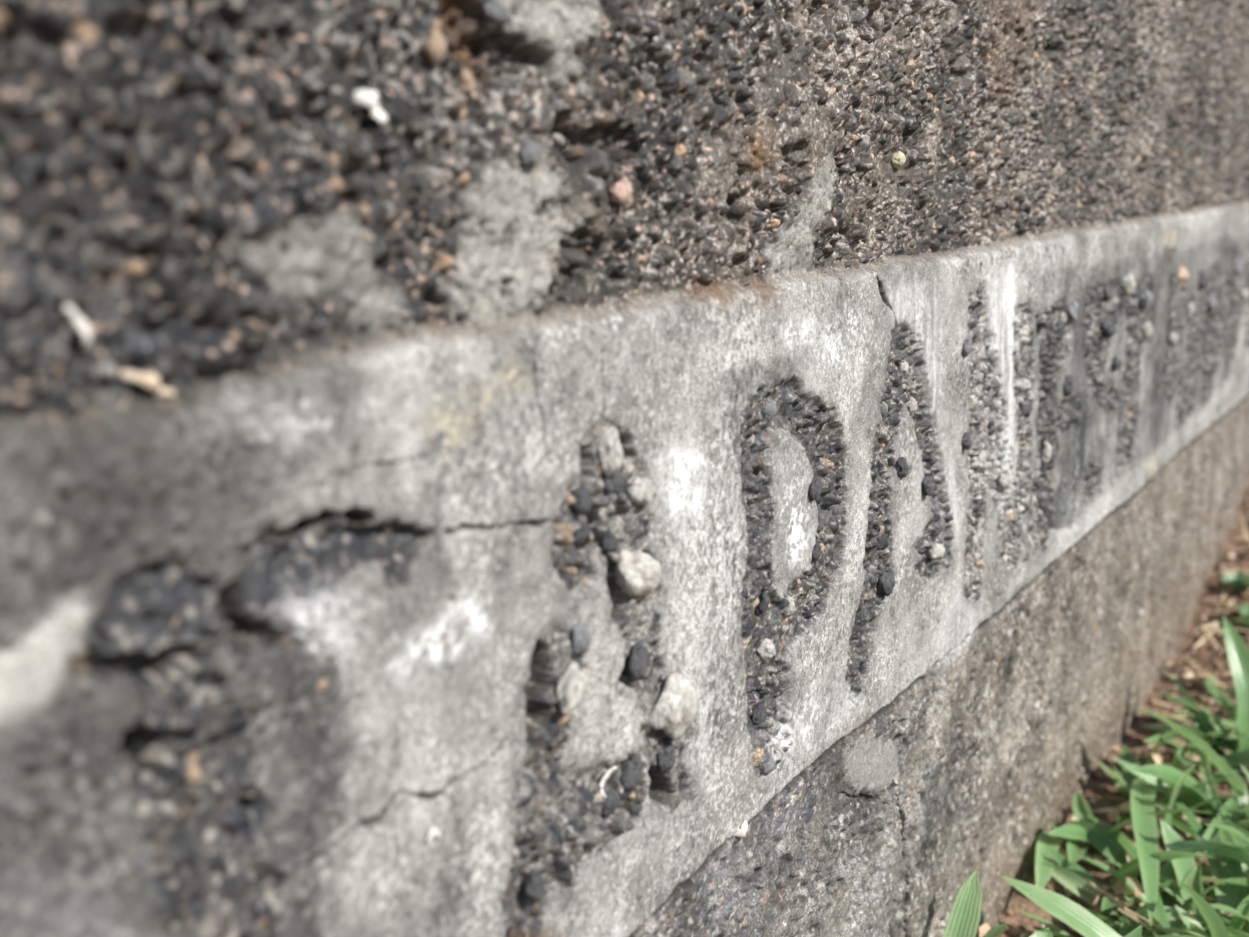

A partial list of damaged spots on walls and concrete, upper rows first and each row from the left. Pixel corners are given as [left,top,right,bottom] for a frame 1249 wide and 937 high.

crack [444,518,553,531]
crack [331,737,508,856]
peeling [425,826,441,843]